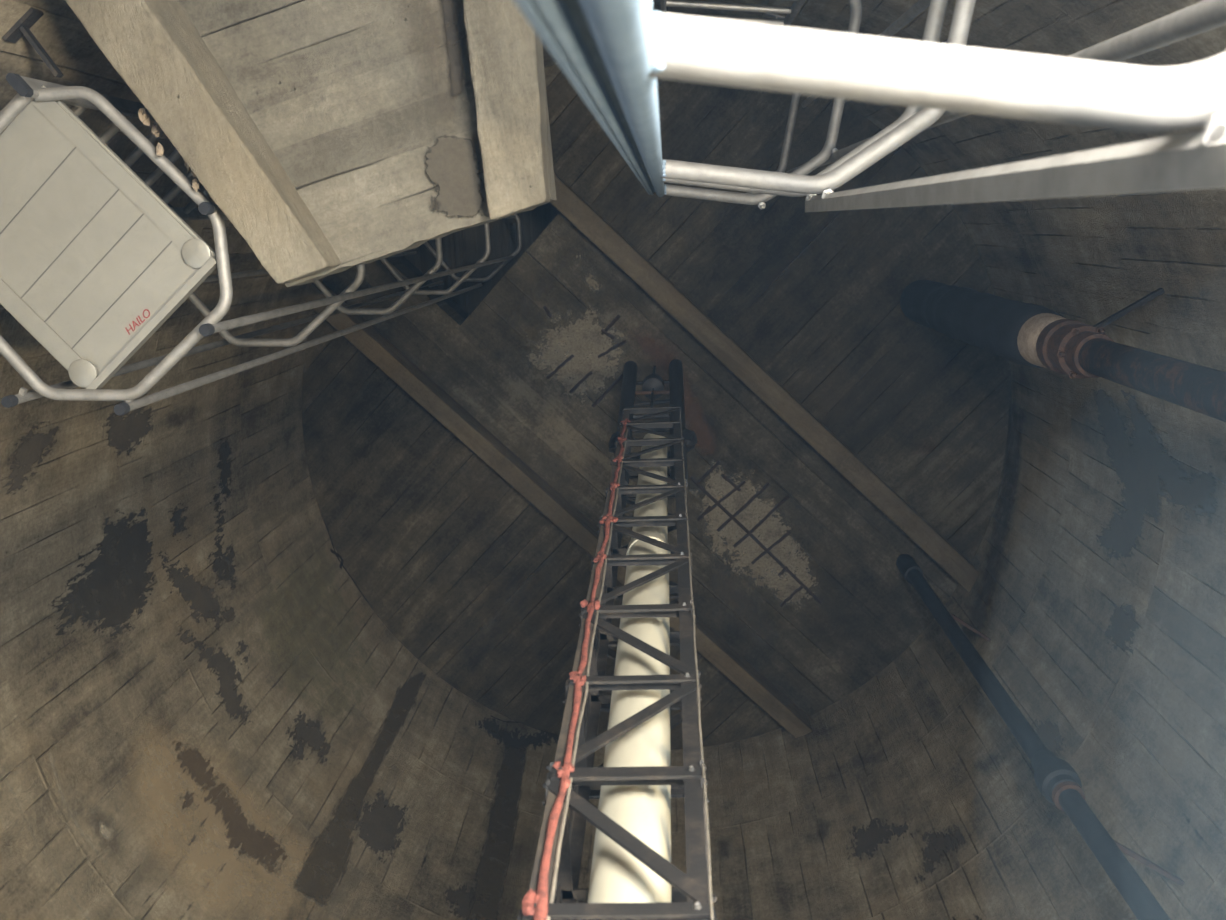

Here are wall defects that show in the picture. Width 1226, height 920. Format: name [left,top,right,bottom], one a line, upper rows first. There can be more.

spalling [425,136,484,218]
spalling [525,272,628,407]
water stain [51,508,156,658]
spalling [689,459,823,611]
water stain [1092,381,1218,566]
water stain [140,672,426,914]